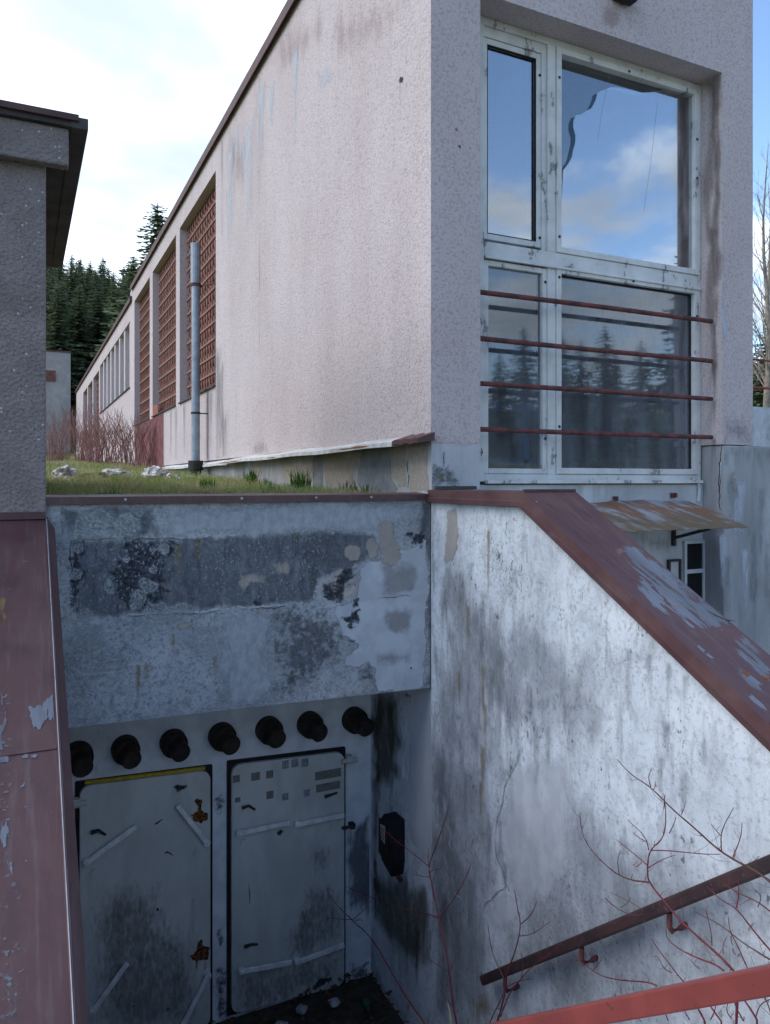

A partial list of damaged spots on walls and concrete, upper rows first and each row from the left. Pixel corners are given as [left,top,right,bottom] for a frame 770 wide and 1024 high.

peeling [239,562,289,590]
peeling [315,509,458,698]
peeling [623,546,730,629]
peeling [734,635,770,711]
peeling [0,692,9,763]
peeling [28,695,54,730]
peeling [0,784,9,848]
rust [191,798,208,823]
crack [481,748,521,917]
rust [190,939,210,968]